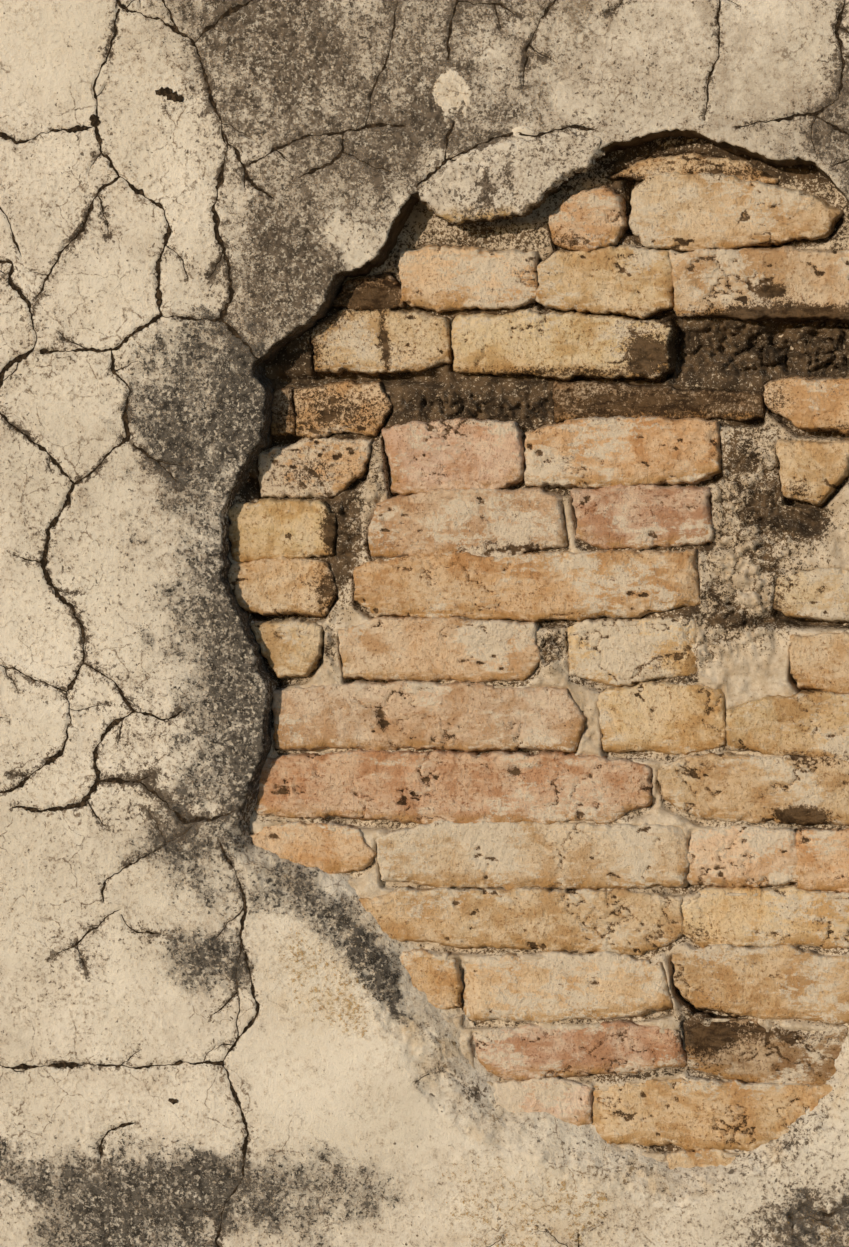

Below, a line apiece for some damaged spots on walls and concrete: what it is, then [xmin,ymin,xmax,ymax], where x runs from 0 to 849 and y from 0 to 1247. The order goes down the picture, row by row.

crack [704,0,738,117]
crack [735,1,849,167]
damp [103,0,600,998]
crack [0,0,594,1247]
spalling [221,126,849,1205]
damp [0,1124,409,1247]
crack [790,1202,849,1246]